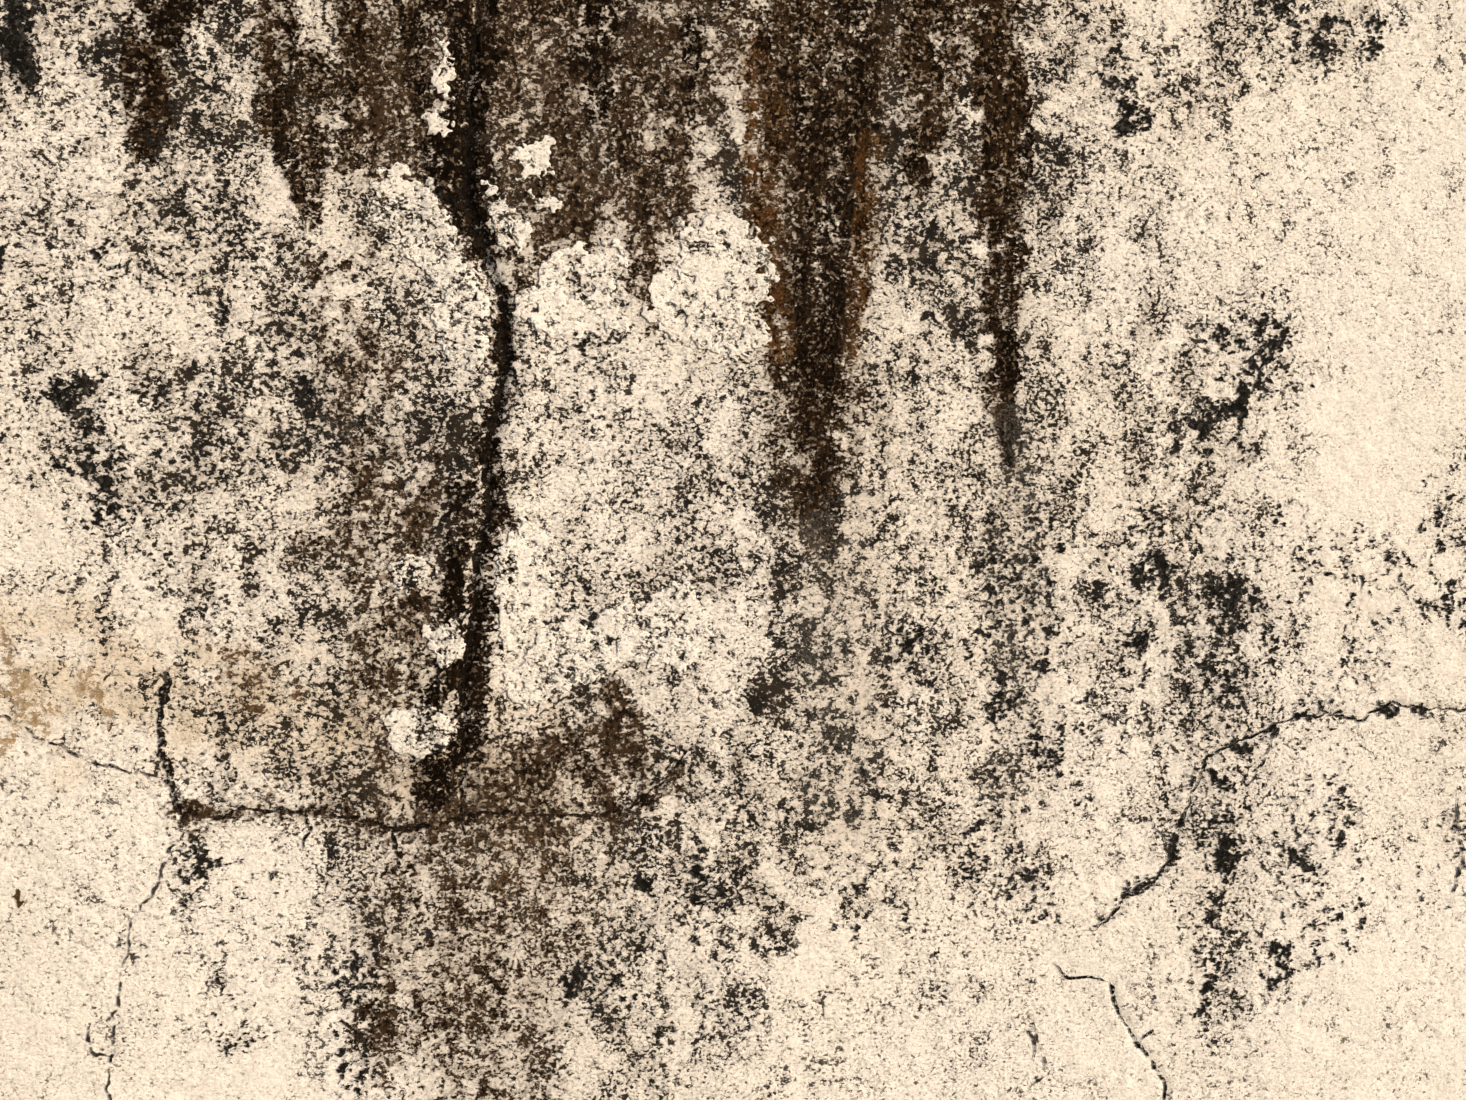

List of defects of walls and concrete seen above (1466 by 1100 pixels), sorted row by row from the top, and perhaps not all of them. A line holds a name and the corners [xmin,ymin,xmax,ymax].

damp [0,0,42,101]
damp [64,0,246,297]
damp [23,347,143,542]
damp [204,272,263,345]
crack [0,0,703,1100]
damp [244,0,1111,1100]
damp [1151,254,1317,458]
damp [0,623,115,765]
crack [1091,694,1466,936]
damp [1111,454,1466,1056]
damp [178,827,280,1063]
crack [1052,962,1167,1100]